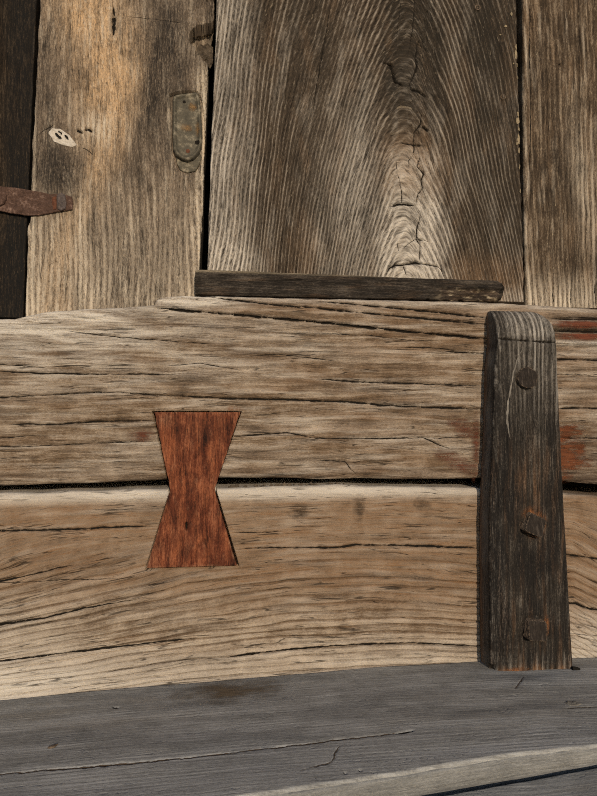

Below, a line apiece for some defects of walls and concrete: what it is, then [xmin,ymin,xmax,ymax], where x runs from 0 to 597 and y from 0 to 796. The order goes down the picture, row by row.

crack [384,0,429,97]
crack [387,120,443,274]
rust [558,321,597,340]
rust [560,425,589,479]
crack [0,731,413,775]